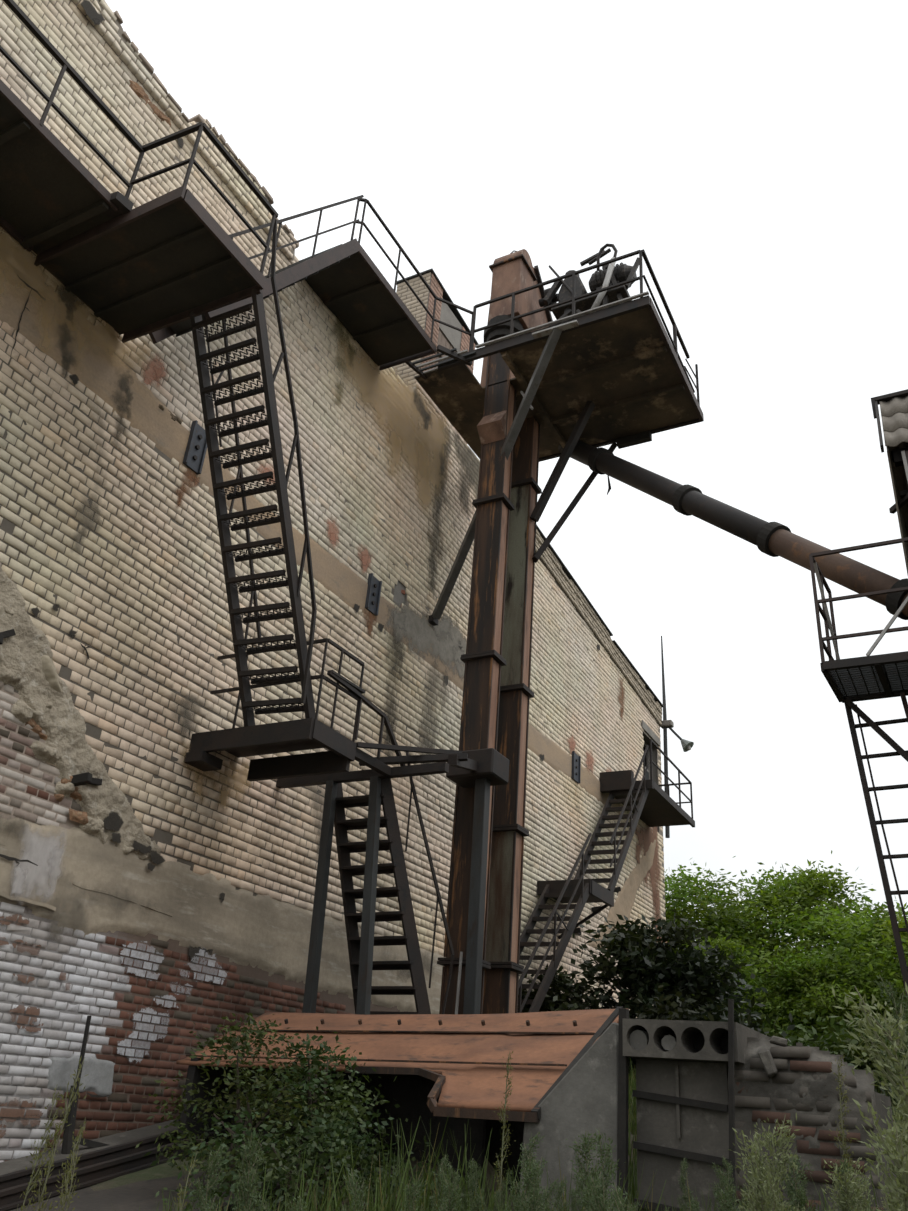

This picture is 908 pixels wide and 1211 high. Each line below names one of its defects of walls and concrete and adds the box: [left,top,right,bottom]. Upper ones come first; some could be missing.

damp [0,235,124,375]
damp [116,377,131,437]
damp [345,345,480,590]
damp [391,639,404,679]
spalling [54,776,89,825]
crack [0,854,38,866]
peeling [112,833,155,871]
peeling [0,914,42,956]
spalling [154,946,213,1008]
peeling [9,1002,43,1032]
peeling [119,1044,143,1062]
peeling [0,1098,43,1138]